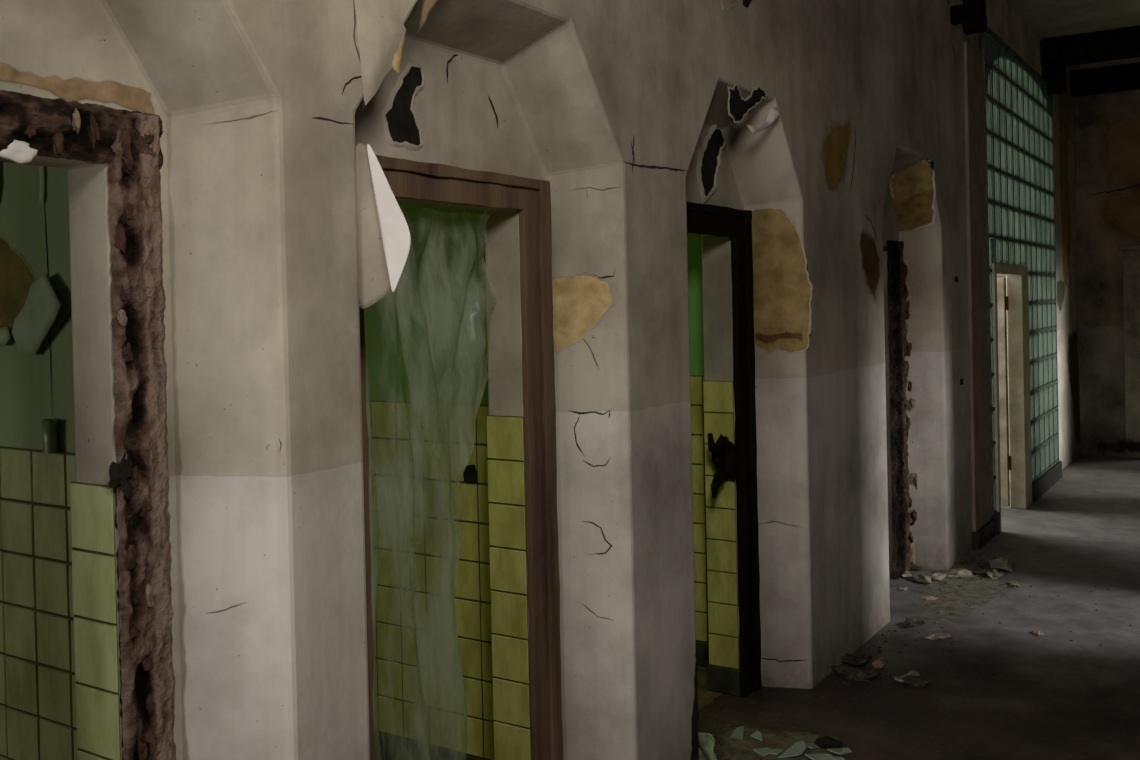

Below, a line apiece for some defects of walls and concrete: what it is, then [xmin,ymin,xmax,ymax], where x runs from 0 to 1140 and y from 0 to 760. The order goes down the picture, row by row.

flaking render [421,0,436,26]
flaking render [381,40,425,151]
flaking render [696,84,780,204]
spalling [0,62,176,760]
peeling [355,143,411,309]
peeling [552,271,616,370]
crack [570,410,610,467]
peeling [751,207,813,355]
spalling [887,158,936,580]